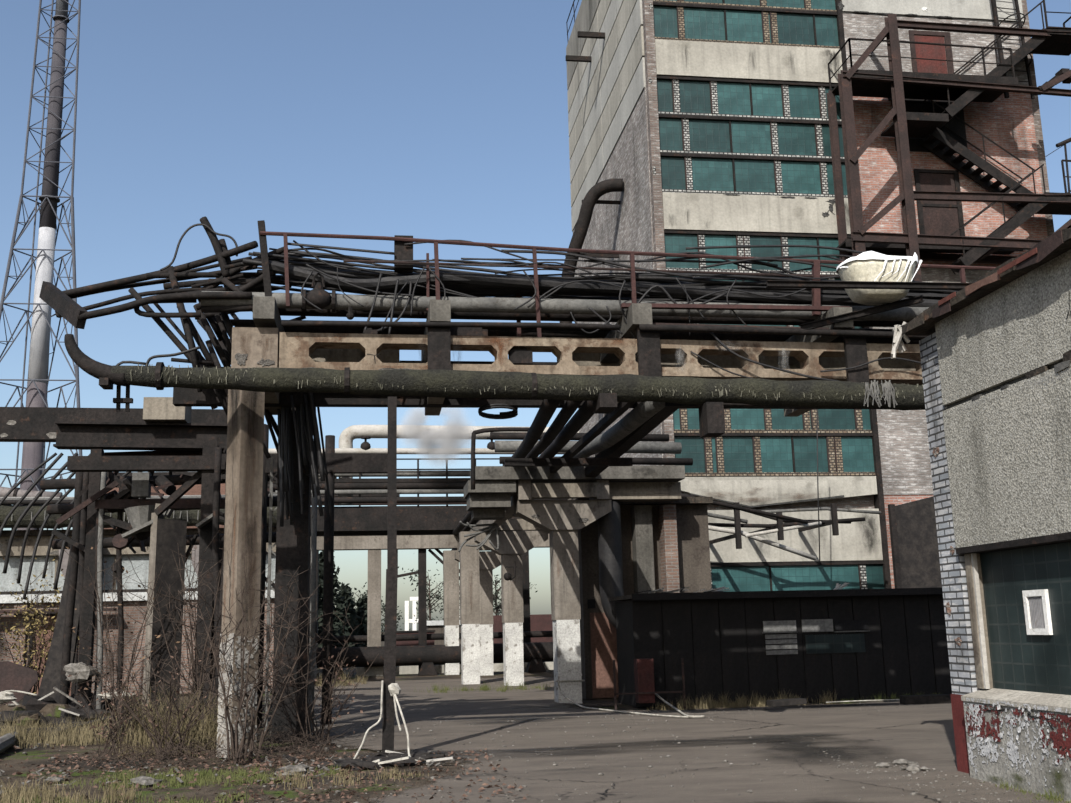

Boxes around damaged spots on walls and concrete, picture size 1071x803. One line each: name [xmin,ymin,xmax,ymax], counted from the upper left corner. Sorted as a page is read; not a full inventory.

peeling [964,697,1071,787]